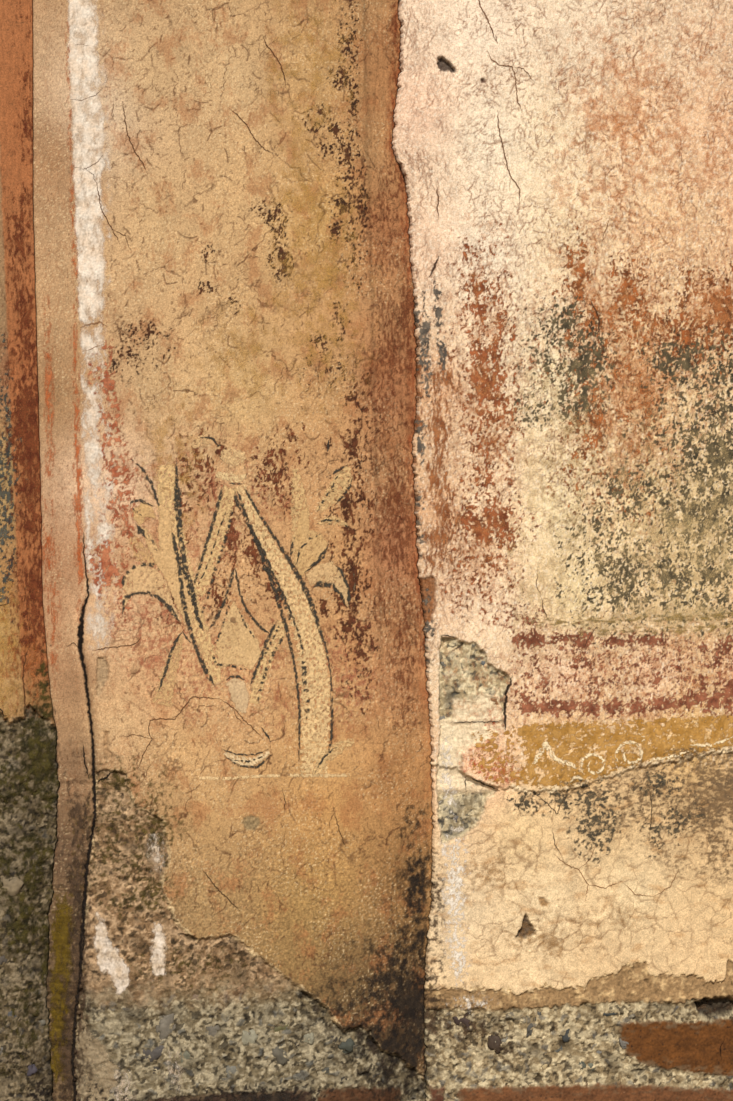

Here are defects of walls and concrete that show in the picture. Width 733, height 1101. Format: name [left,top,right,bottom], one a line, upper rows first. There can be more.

crack [123,108,148,174]
crack [76,156,131,250]
water stain [413,281,448,402]
water stain [514,296,627,431]
water stain [414,420,427,465]
water stain [553,326,733,642]
water stain [422,589,436,672]
crack [456,676,513,730]
flaking render [436,625,733,845]
crack [464,777,679,900]
flaking render [0,705,60,1101]
flaking render [75,731,733,1101]